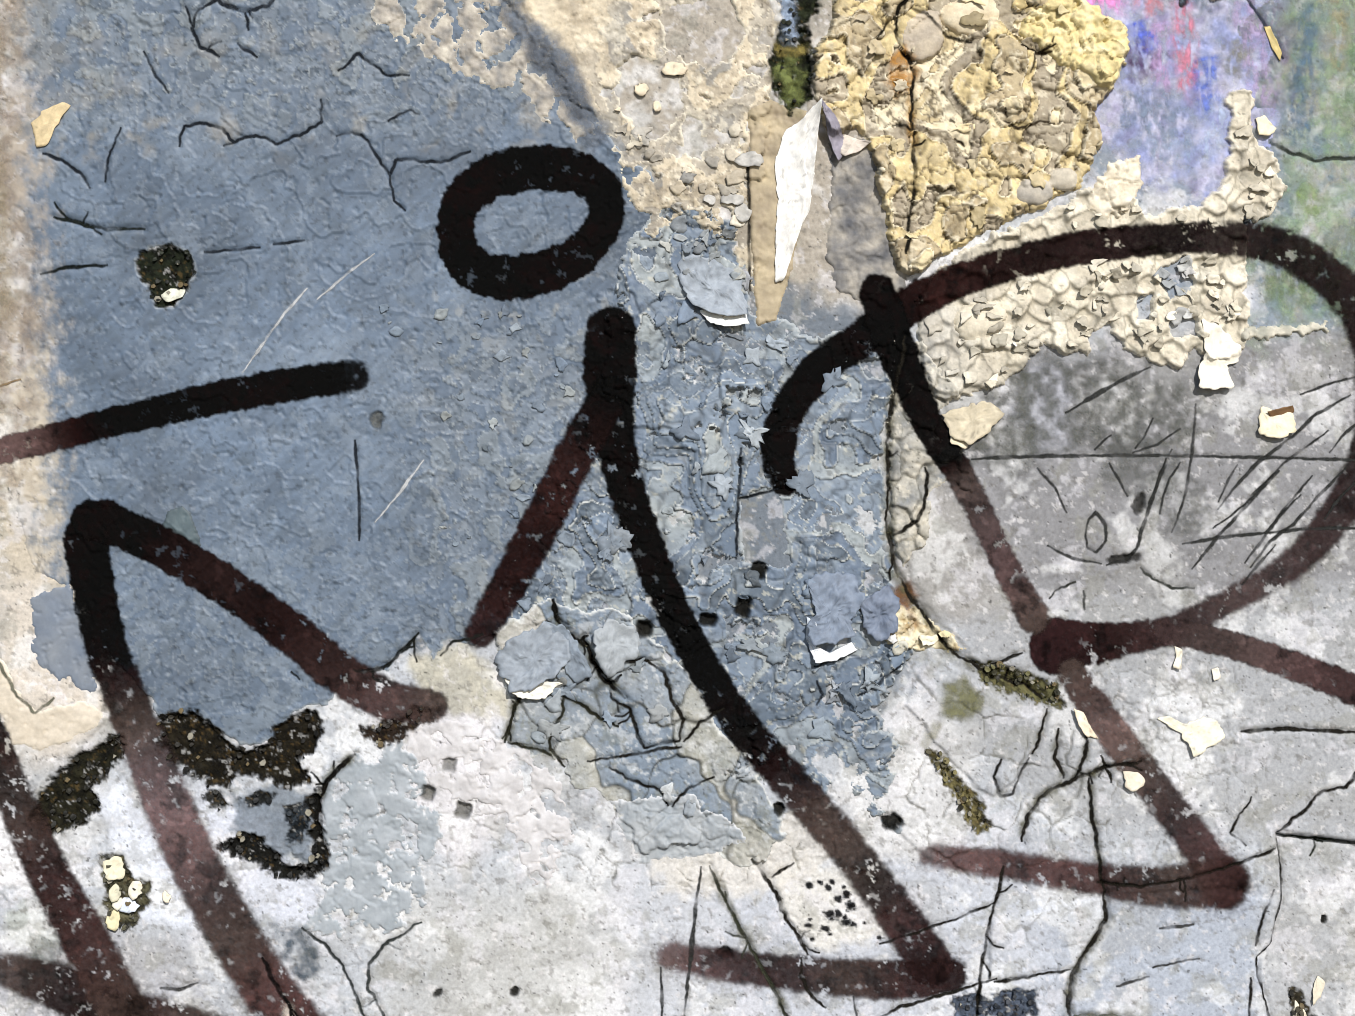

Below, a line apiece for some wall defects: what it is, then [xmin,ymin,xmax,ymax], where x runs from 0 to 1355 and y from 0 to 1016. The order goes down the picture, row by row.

crack [41,127,146,274]
crack [143,51,169,92]
crack [185,0,274,58]
crack [204,240,303,253]
crack [179,52,471,211]
peeling [359,0,1329,888]
crack [501,598,725,807]
crack [814,657,842,705]
crack [857,663,904,696]
crack [879,335,1355,1016]
crack [709,858,826,1016]